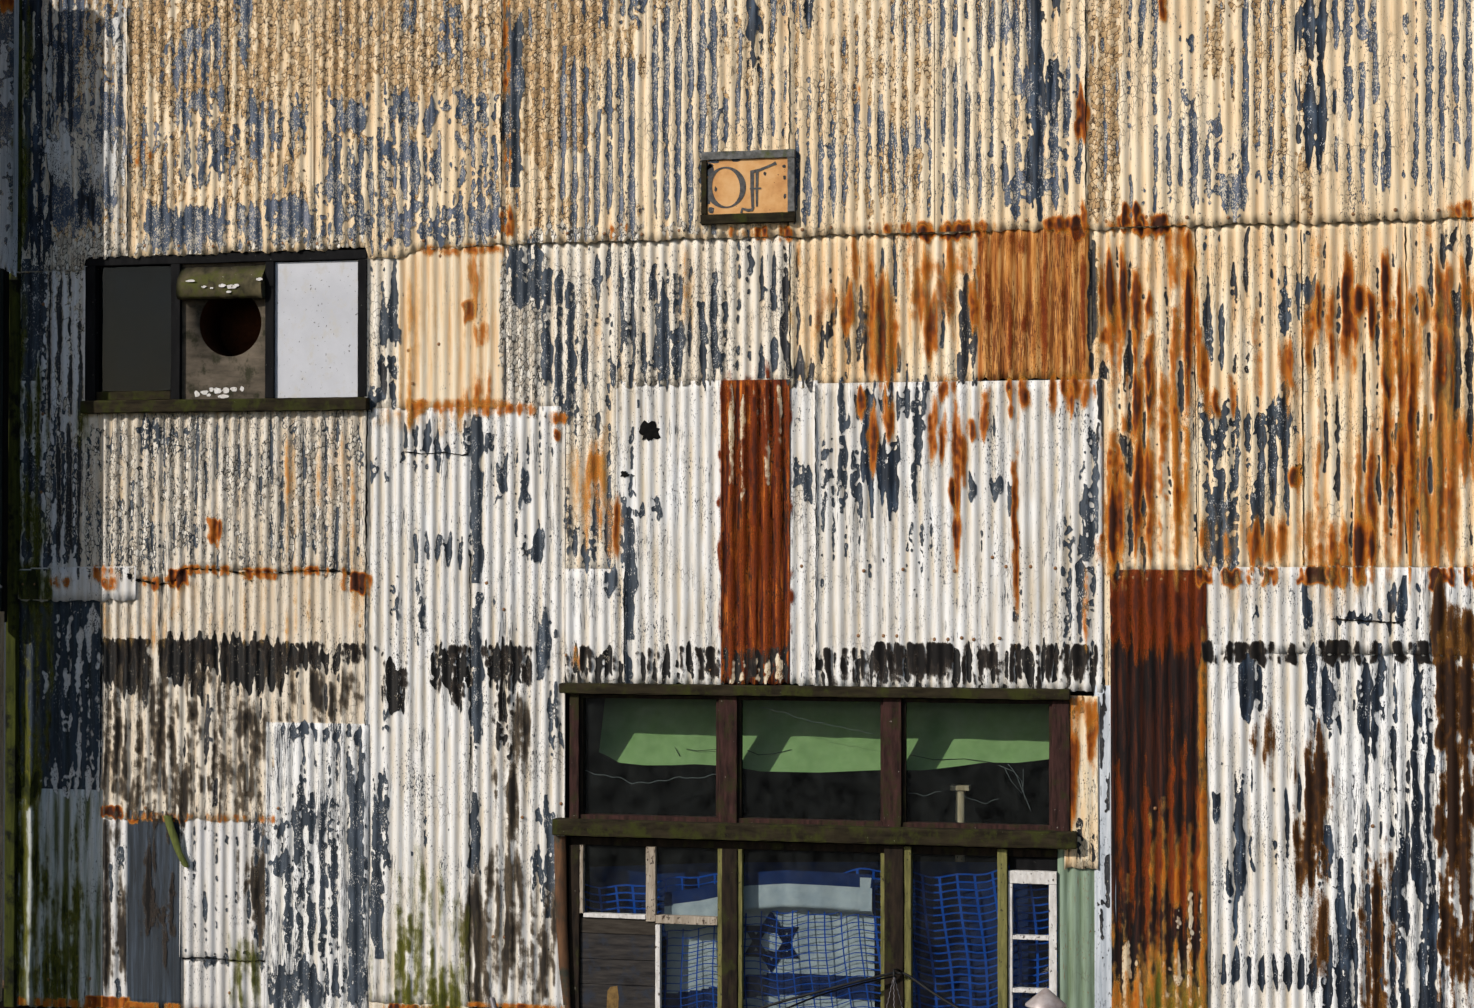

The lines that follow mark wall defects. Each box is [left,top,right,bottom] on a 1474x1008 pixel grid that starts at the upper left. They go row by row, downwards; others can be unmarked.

leakage [102,630,407,993]
corrosion [142,517,372,603]
peeling [183,674,391,1008]
corrosion [421,205,515,345]
peeling [0,0,1104,756]
leakage [564,641,789,685]
corrosion [716,363,794,679]
leakage [816,637,1105,697]
peeling [1061,232,1158,659]
corrosion [814,199,1474,1008]
peeling [1102,0,1474,580]
peeling [1162,570,1444,1008]